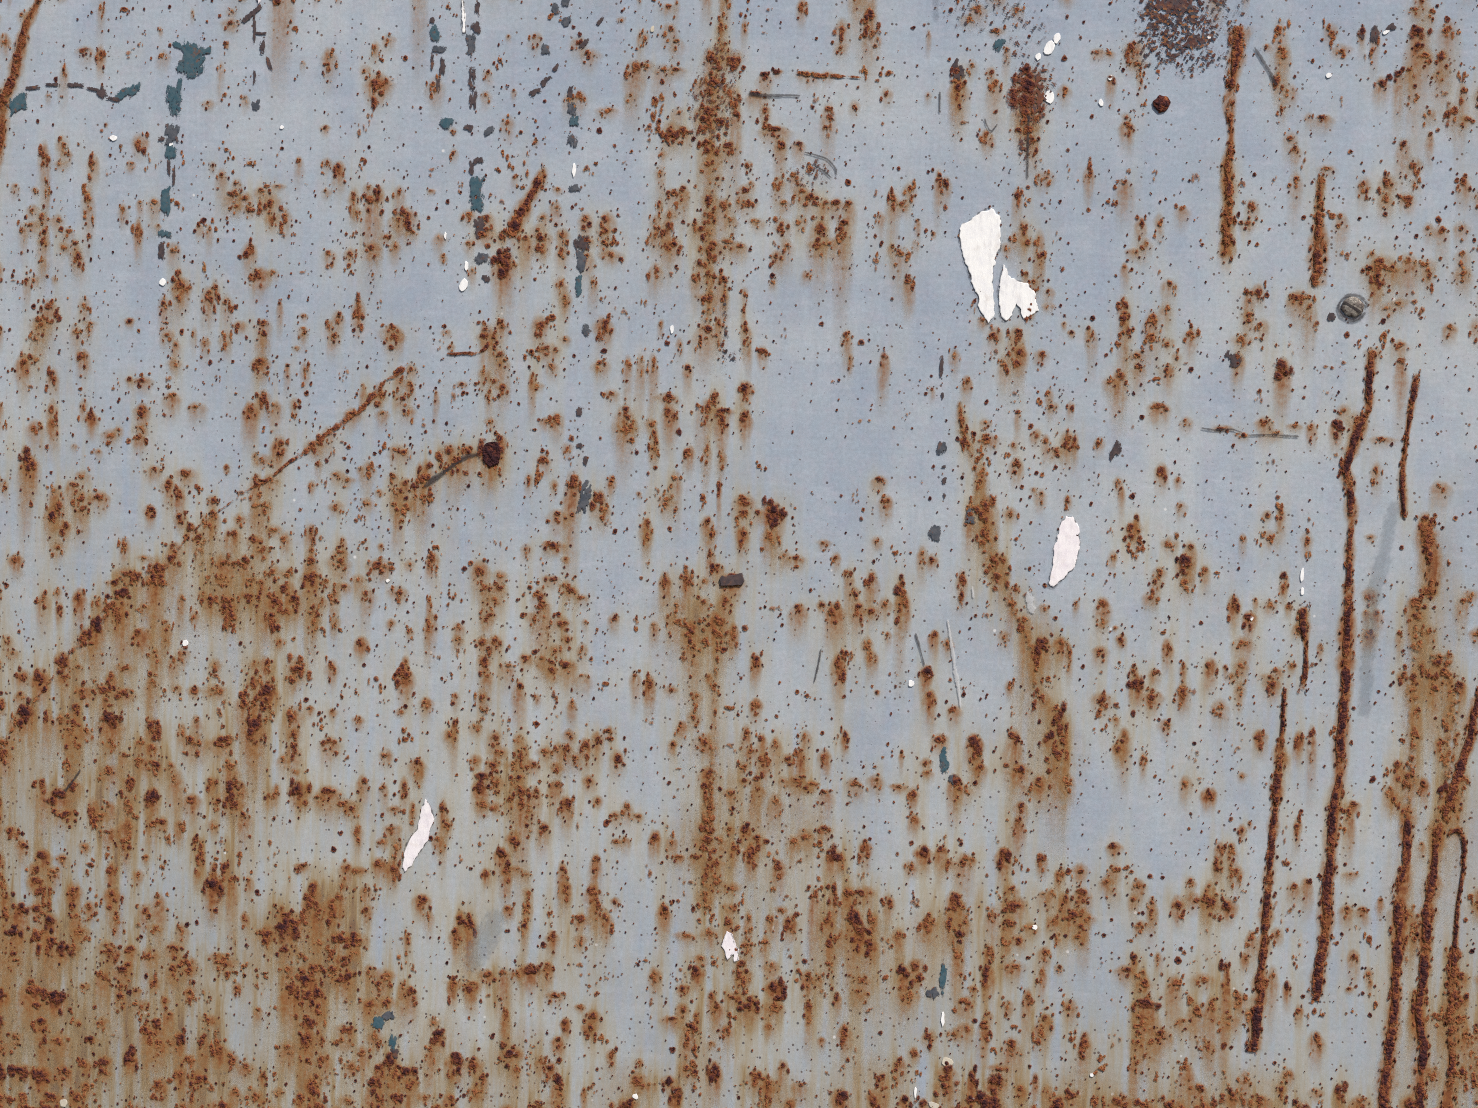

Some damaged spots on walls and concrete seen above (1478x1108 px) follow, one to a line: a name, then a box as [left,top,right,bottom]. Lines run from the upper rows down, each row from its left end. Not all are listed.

peeling [241,0,273,110]
rust [1066,14,1161,139]
rust [107,193,184,246]
rust [865,155,960,300]
peeling [959,208,1039,323]
rust [828,331,913,429]
peeling [1048,516,1080,587]
rust [1057,473,1154,588]
rust [1154,460,1185,502]
rust [1233,491,1314,561]
rust [889,647,971,720]
peeling [402,799,434,872]